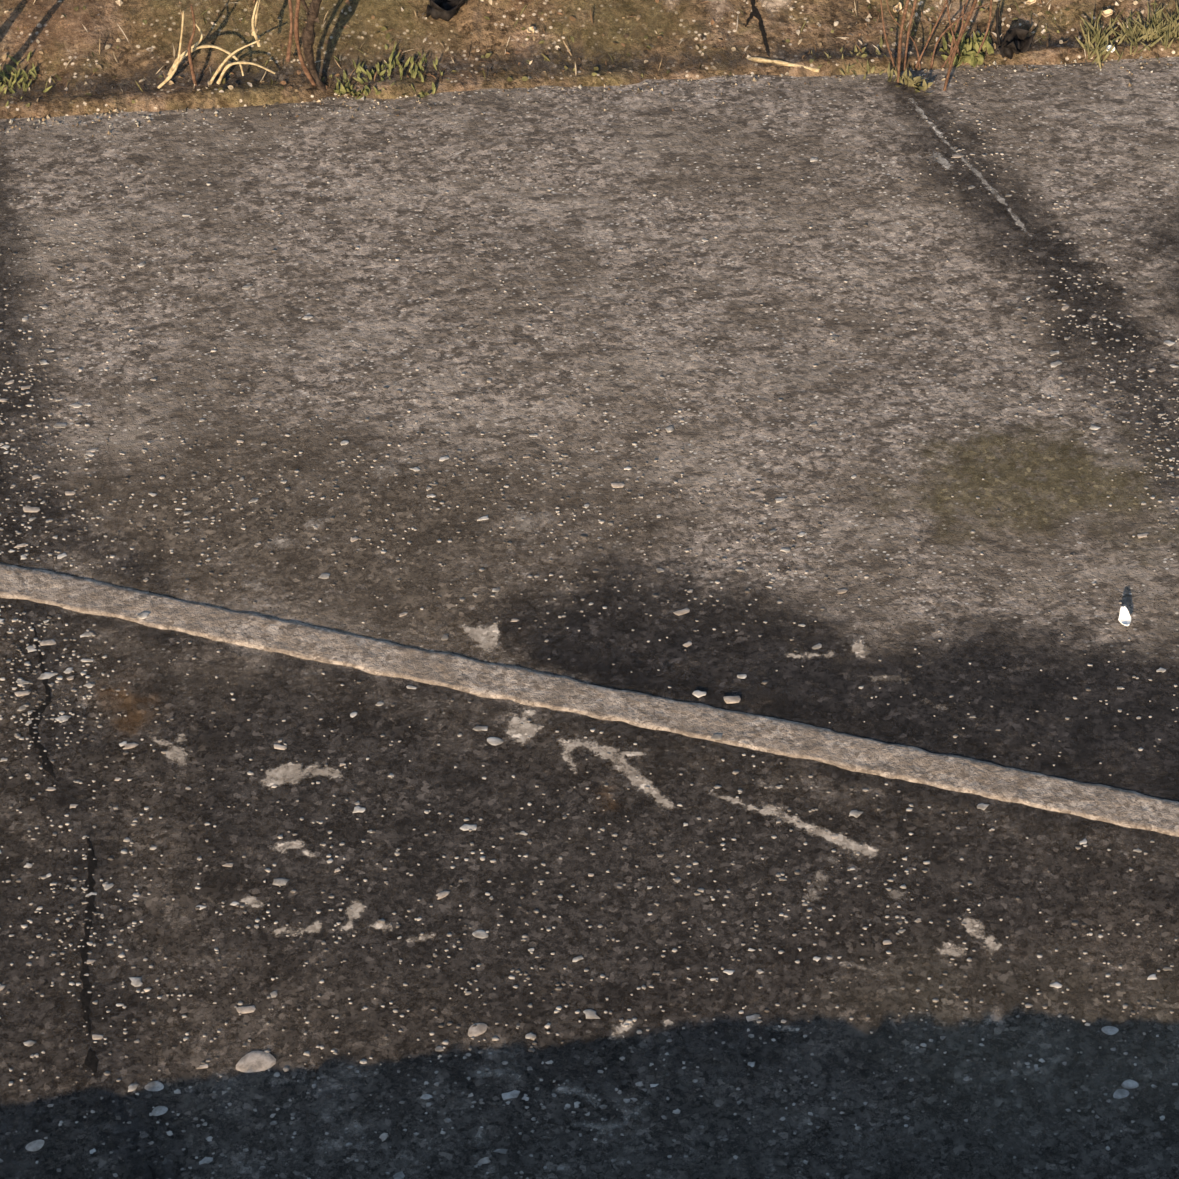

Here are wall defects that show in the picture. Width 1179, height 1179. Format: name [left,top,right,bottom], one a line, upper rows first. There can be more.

crack [29,624,55,778]
crack [79,836,98,1074]